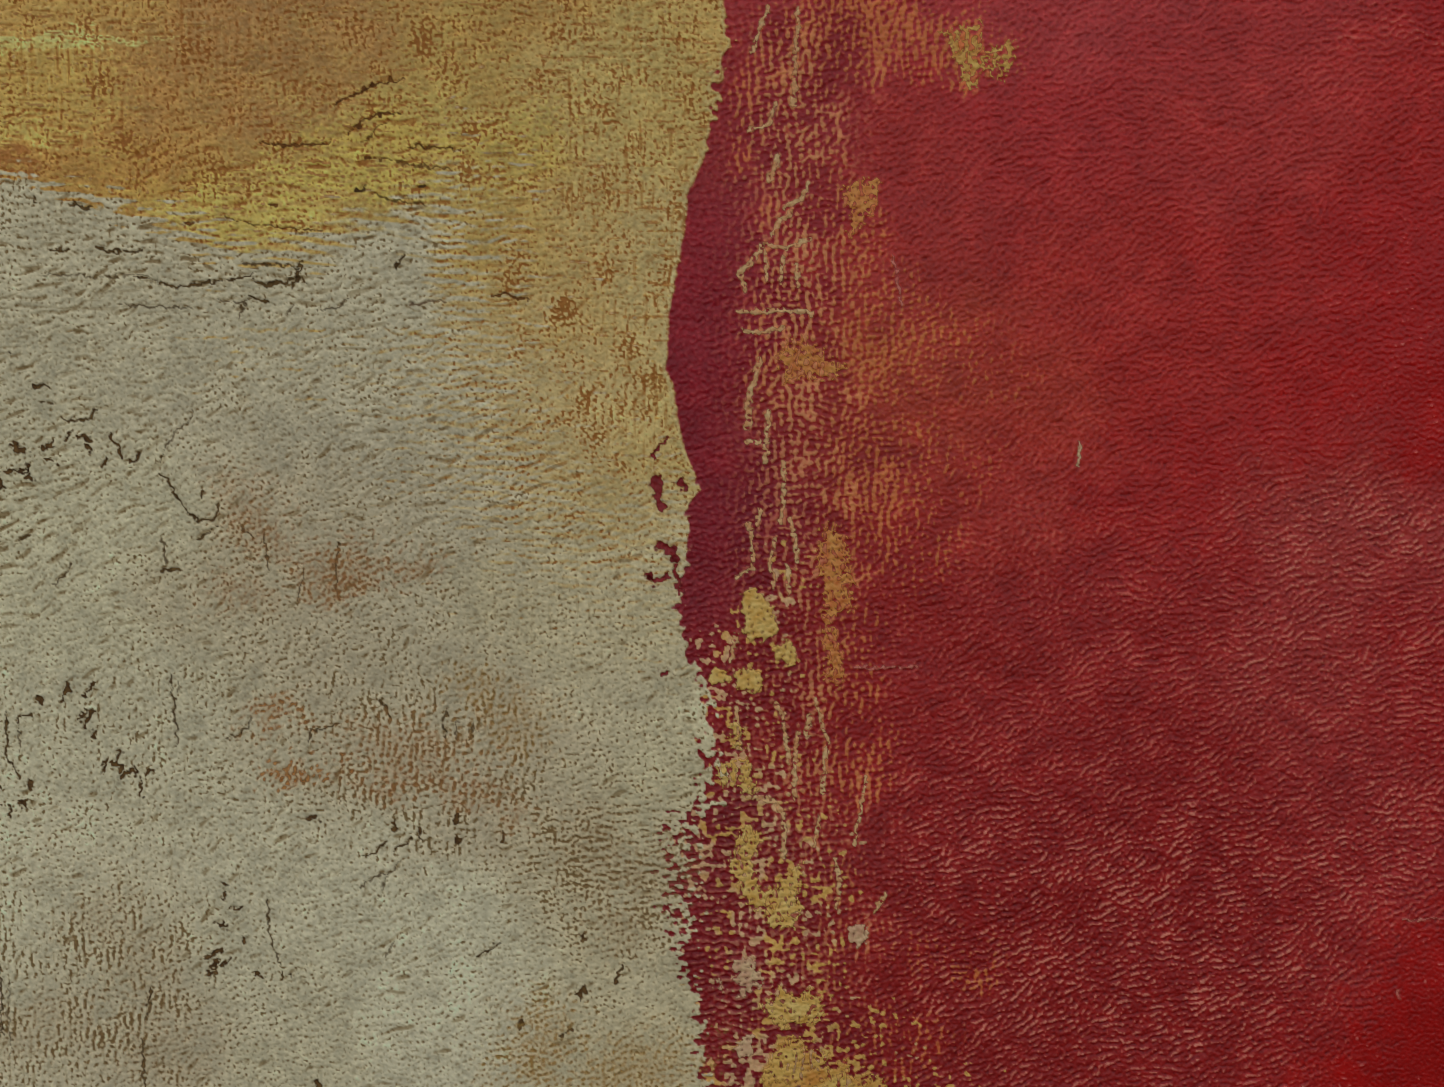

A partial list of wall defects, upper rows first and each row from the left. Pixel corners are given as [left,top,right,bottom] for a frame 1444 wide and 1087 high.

peeling [747,4,801,132]
peeling [940,19,1018,90]
peeling [767,154,780,183]
peeling [839,176,882,239]
peeling [649,436,688,512]
peeling [645,541,685,596]
peeling [708,181,857,931]
peeling [852,775,868,846]
peeling [848,892,887,949]
peeling [716,957,887,1087]